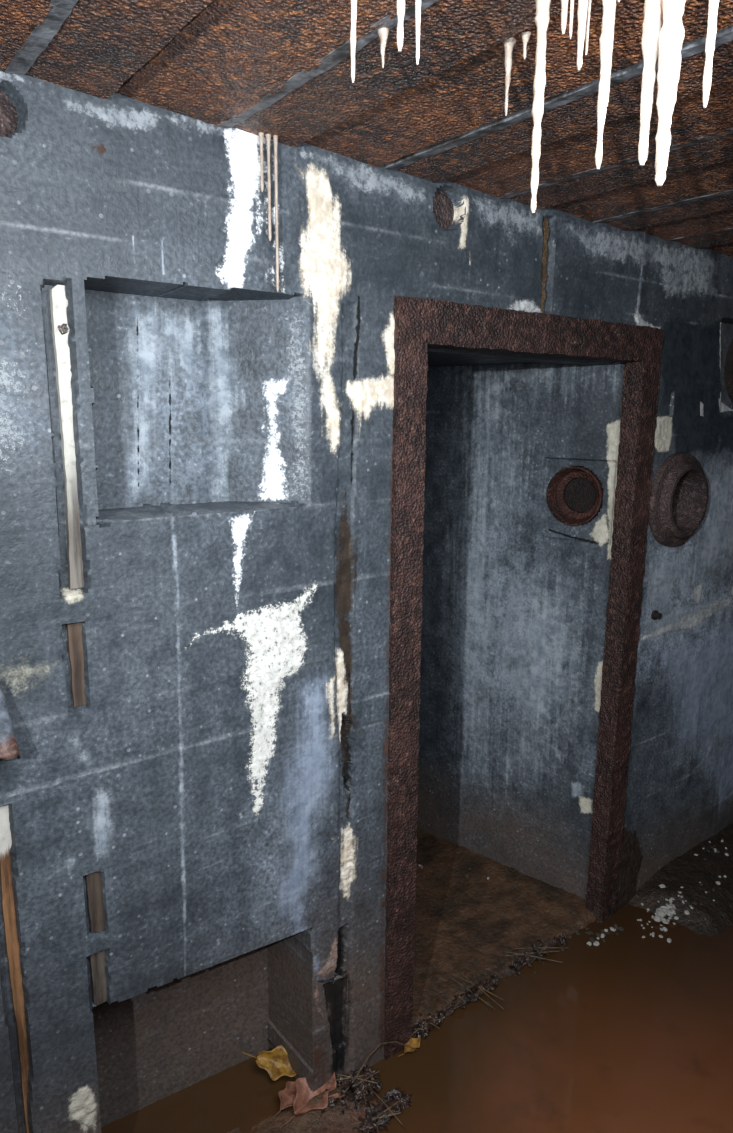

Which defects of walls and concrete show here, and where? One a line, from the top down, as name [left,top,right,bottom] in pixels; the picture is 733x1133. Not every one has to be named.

leakage [216,128,279,289]
leakage [258,163,395,501]
rust [541,218,550,313]
leakage [191,514,318,815]
peeling [641,584,733,640]